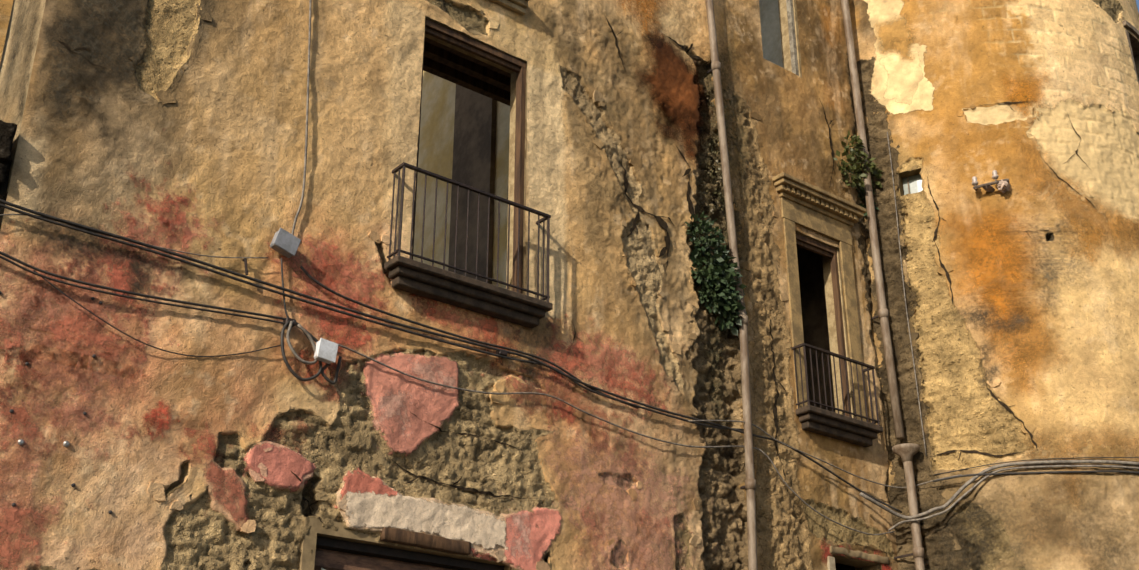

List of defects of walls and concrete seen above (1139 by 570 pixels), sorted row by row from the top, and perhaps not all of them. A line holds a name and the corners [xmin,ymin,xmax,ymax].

rust [622,0,706,162]
flaking render [864,0,935,114]
flaking render [1090,0,1125,26]
crack [621,146,697,270]
flaking render [957,98,1139,225]
rust [1027,151,1139,257]
flaking render [896,154,1042,475]
peeling [0,190,207,570]
peeling [145,401,398,534]
crack [926,384,1038,460]